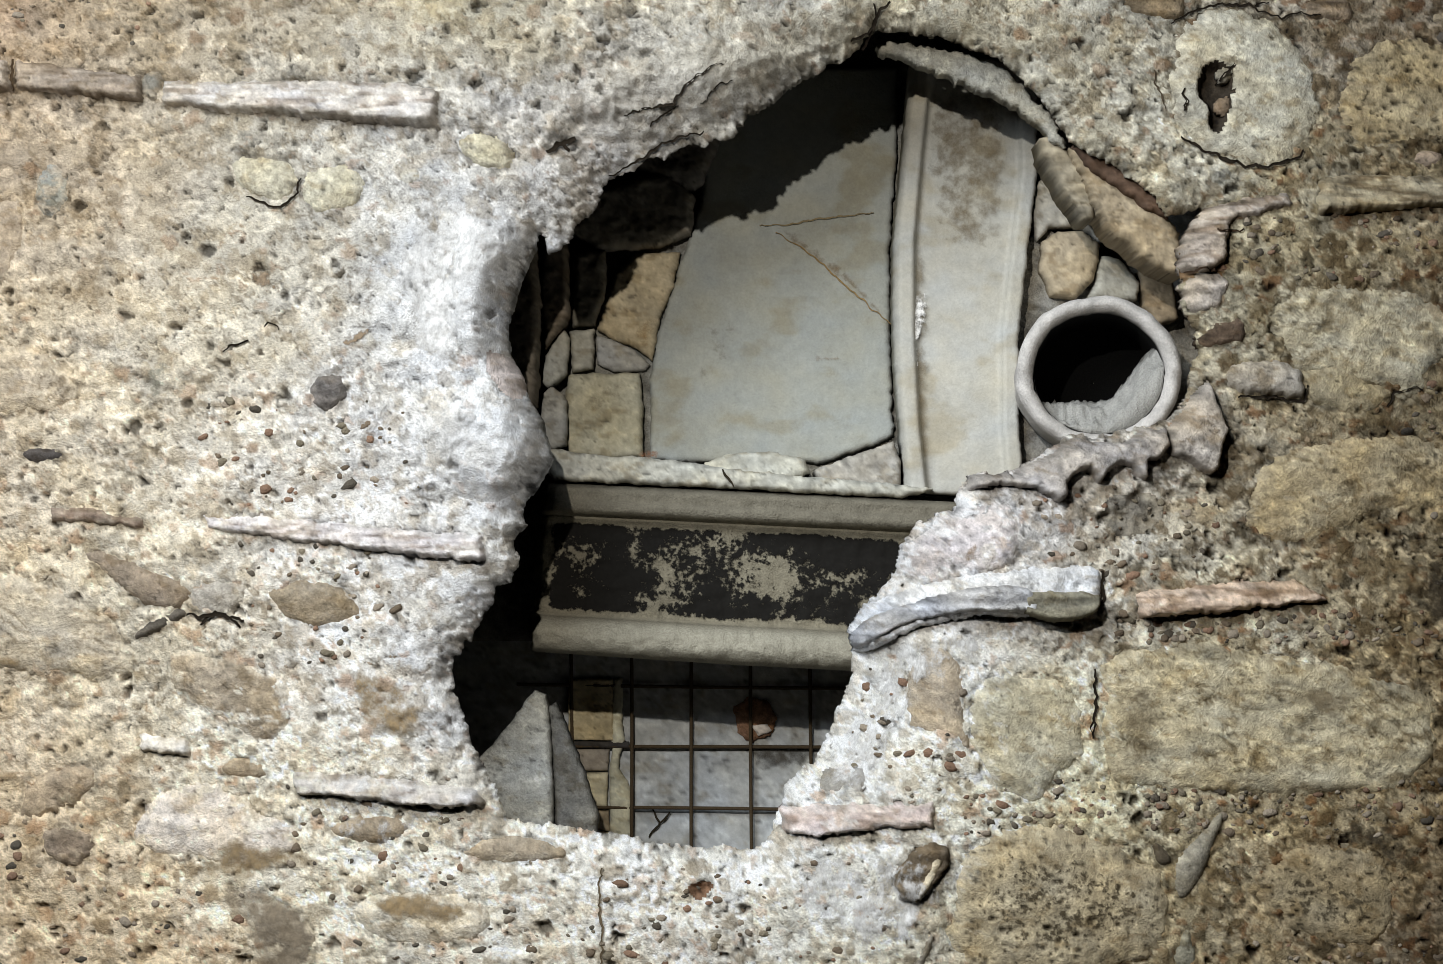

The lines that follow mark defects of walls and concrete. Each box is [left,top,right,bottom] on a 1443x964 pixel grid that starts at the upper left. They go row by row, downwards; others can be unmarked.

crack [851,1,891,51]
crack [609,63,733,177]
spalling [1198,60,1236,134]
spalling [1031,137,1292,351]
spalling [486,350,527,400]
spalling [1100,490,1163,538]
spalling [733,696,777,743]
crack [1090,669,1099,739]